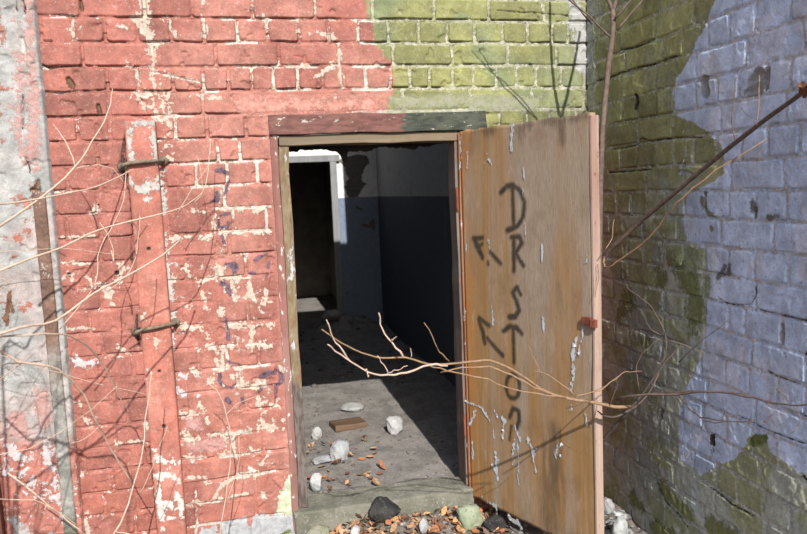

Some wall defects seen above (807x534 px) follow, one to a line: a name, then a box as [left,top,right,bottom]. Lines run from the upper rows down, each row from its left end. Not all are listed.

peeling [66,0,84,43]
peeling [283,14,346,90]
peeling [115,0,223,216]
peeling [61,260,130,306]
peeling [69,343,129,369]
peeling [151,187,285,534]